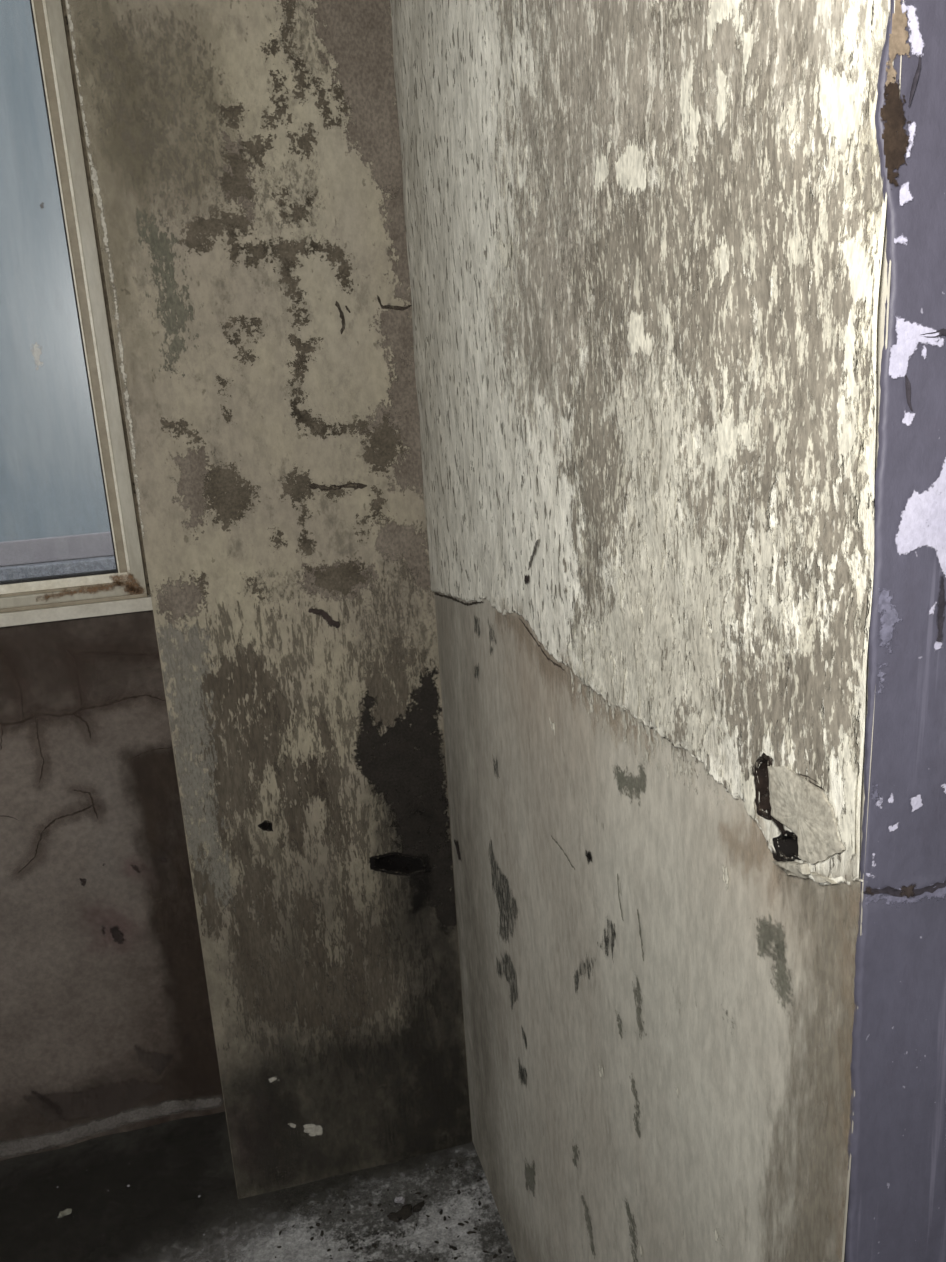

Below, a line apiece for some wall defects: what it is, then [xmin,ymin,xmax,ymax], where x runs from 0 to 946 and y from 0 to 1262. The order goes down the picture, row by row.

leakage [134,195,199,378]
peeling [476,0,924,884]
peeling [889,317,944,426]
peeling [895,457,946,650]
crack [0,648,166,783]
crack [1,790,98,872]
leakage [0,633,472,1262]
crack [863,880,946,905]